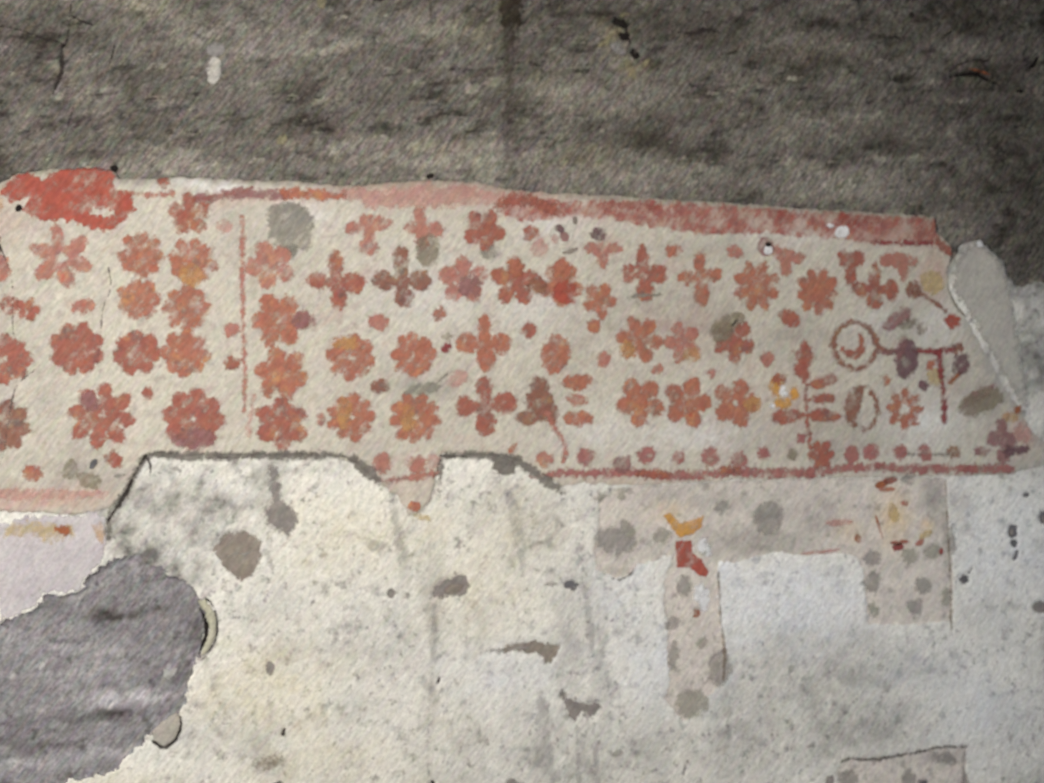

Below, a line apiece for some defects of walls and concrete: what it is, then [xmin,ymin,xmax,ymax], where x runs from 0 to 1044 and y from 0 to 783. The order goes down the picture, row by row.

leakage [500,0,524,39]
crack [0,4,93,94]
peeling [104,450,381,540]
peeling [438,451,563,495]
flaking render [213,531,262,581]
flaking render [433,575,470,599]
flaking render [545,580,579,591]
flaking render [0,555,218,783]
flaking render [497,640,560,663]
flaking render [559,689,600,721]